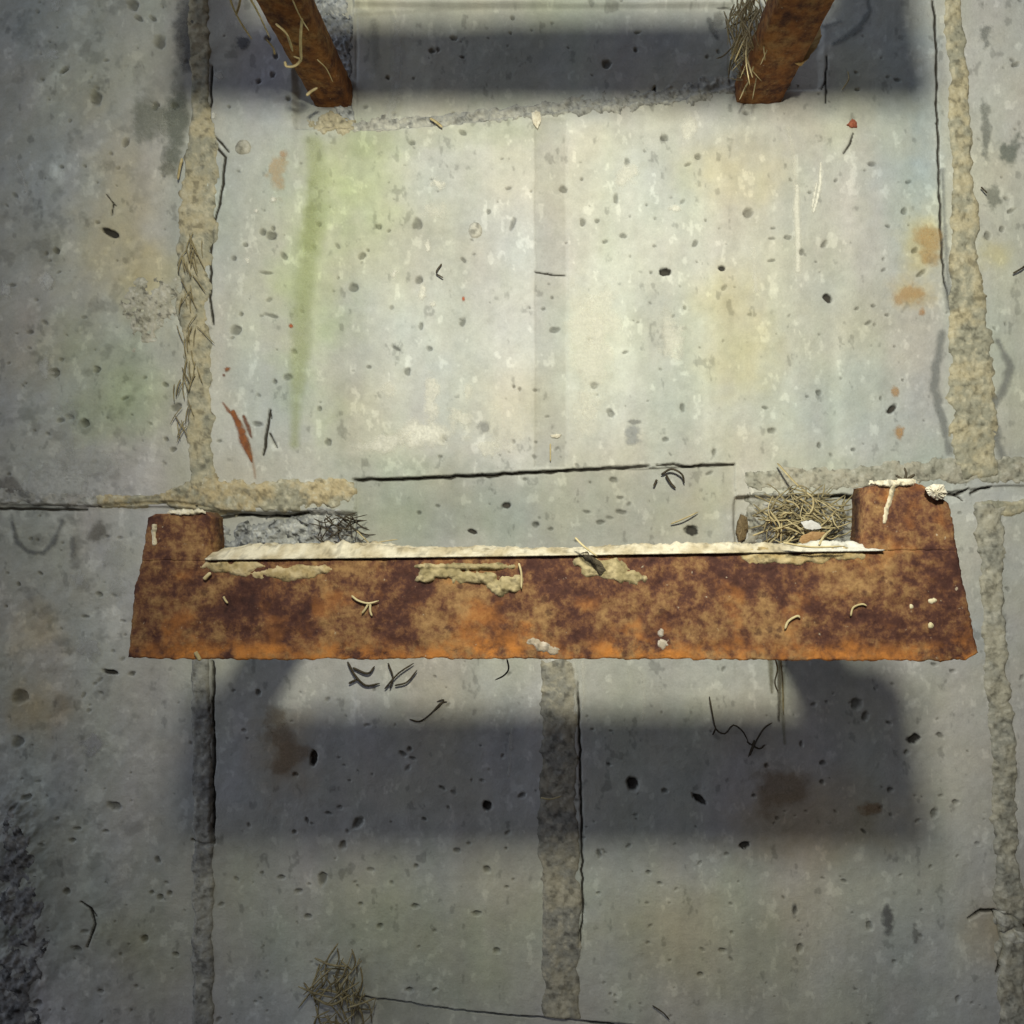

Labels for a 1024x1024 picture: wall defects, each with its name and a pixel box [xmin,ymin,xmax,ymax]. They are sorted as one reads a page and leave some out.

crack [932,1,948,299]
crack [354,463,734,482]
crack [576,682,584,941]